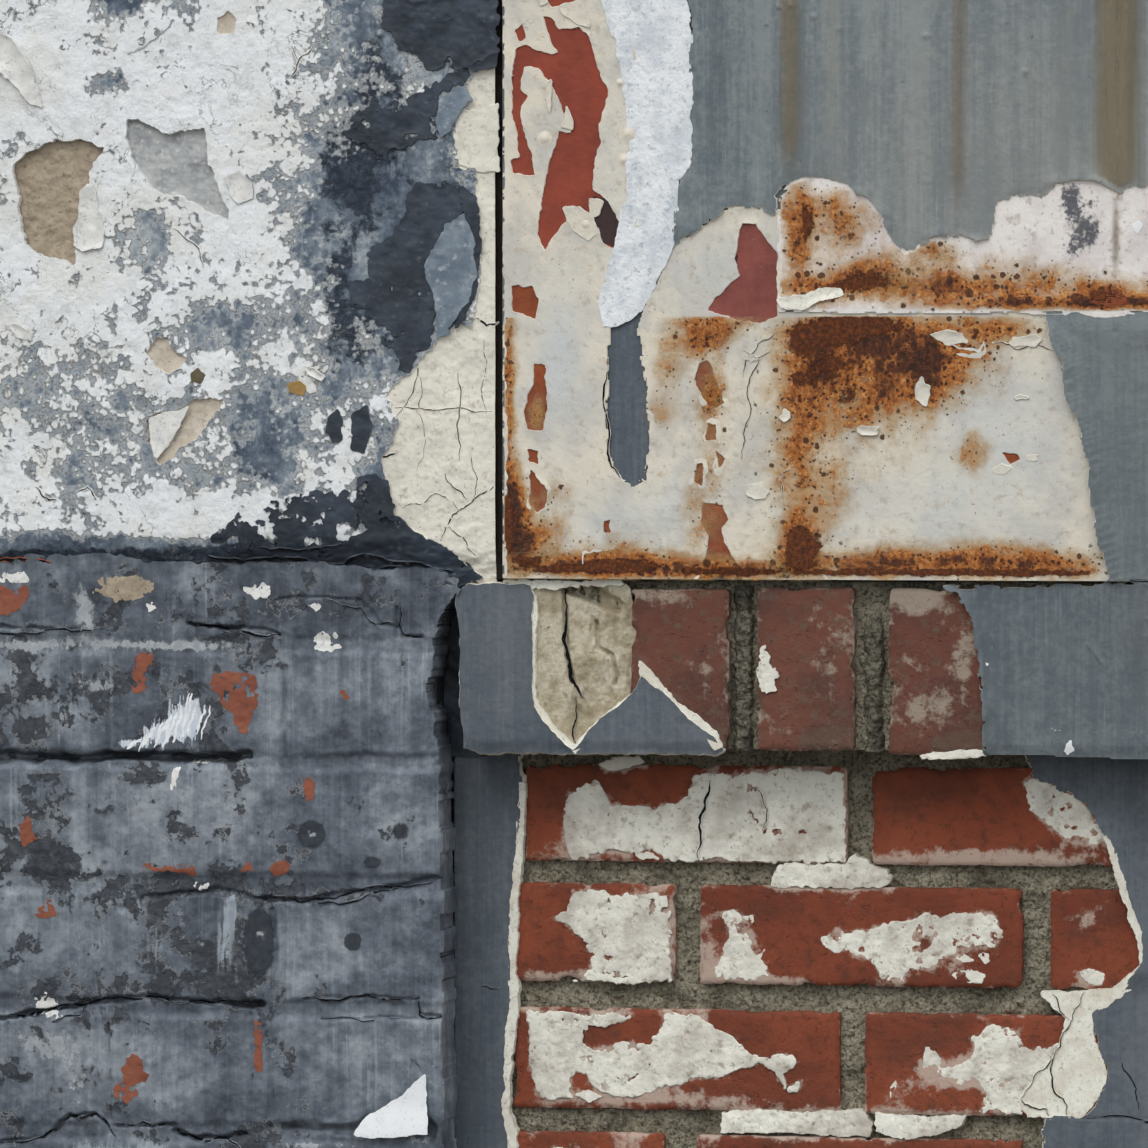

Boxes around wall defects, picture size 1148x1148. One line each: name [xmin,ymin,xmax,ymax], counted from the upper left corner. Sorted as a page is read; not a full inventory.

corrosion [504,183,1148,581]